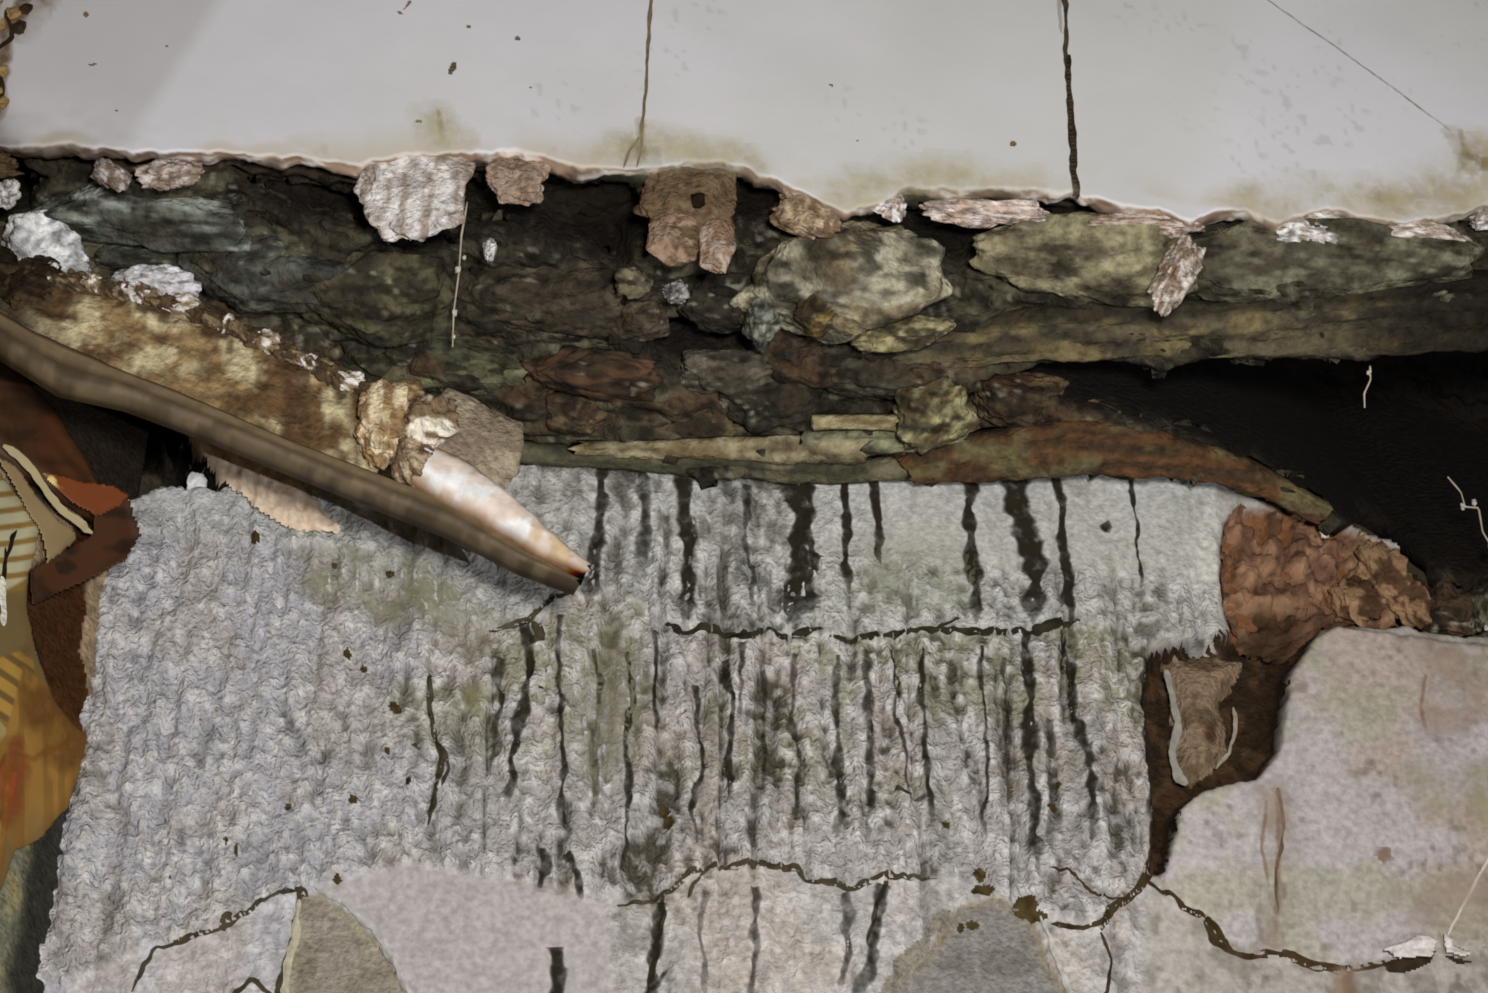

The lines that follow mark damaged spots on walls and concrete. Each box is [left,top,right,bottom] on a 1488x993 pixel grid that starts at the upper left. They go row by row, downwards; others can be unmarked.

crack [623,0,653,168]
crack [1058,0,1080,199]
water stain [674,475,697,615]
water stain [778,484,821,616]
water stain [840,484,853,586]
water stain [962,482,984,615]
water stain [491,623,535,795]
crack [664,616,1080,646]
water stain [977,478,1098,853]
crack [617,857,937,986]
crack [1050,821,1397,993]
crack [1275,788,1286,913]